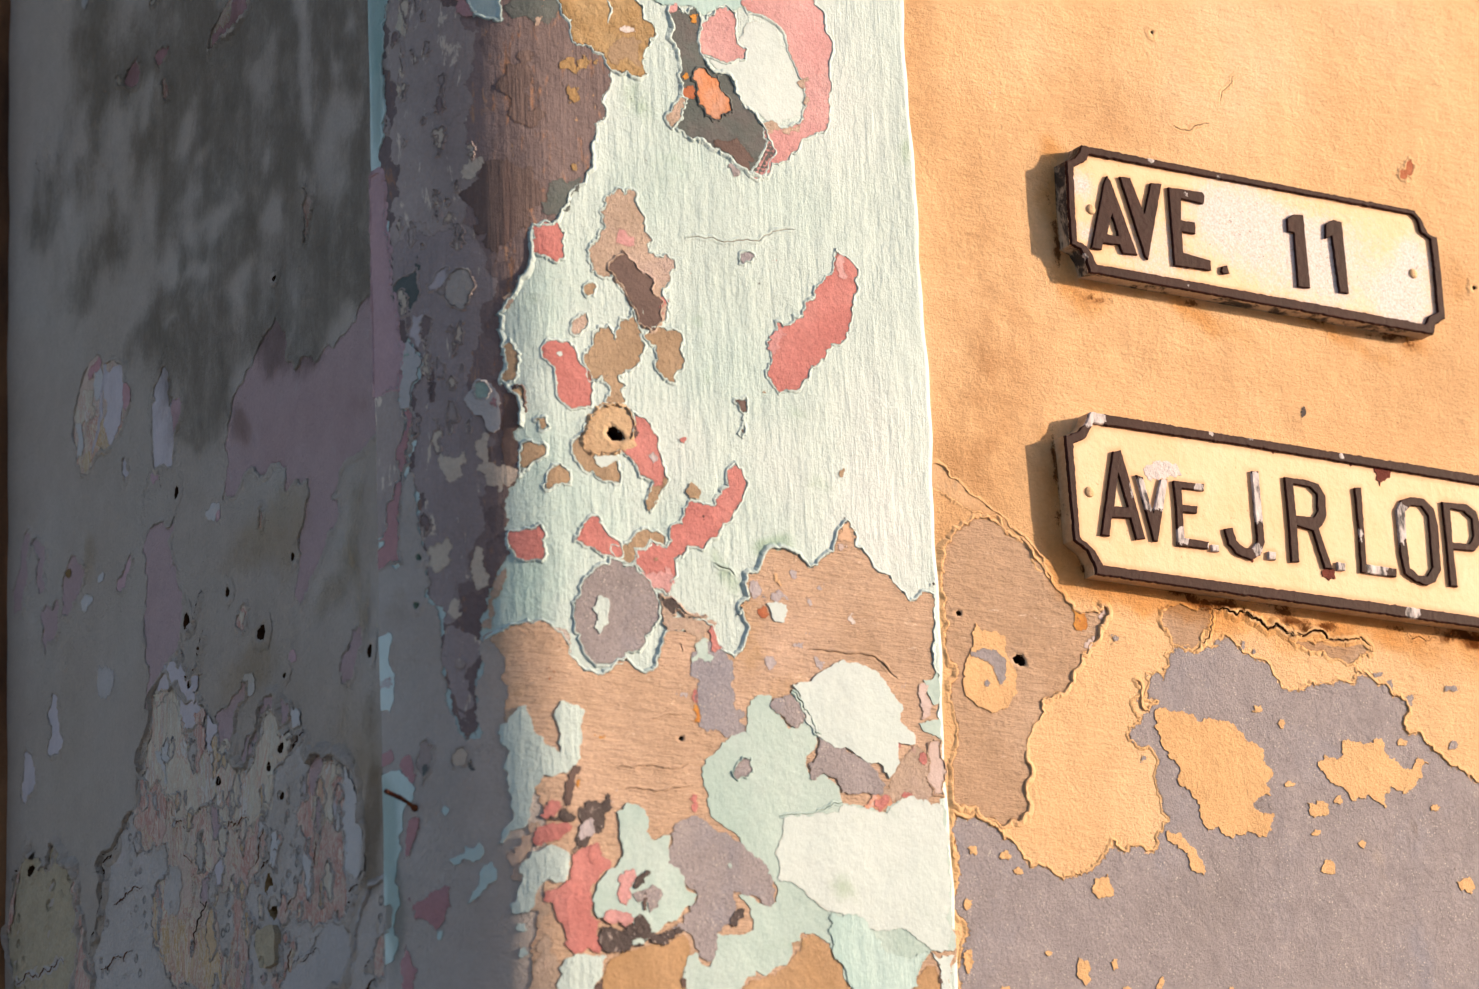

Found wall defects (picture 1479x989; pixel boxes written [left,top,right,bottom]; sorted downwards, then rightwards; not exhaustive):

peeling [662,0,836,183]
peeling [763,248,861,396]
flaking render [0,0,778,989]
crack [1192,601,1436,654]
flaking render [682,458,1479,989]